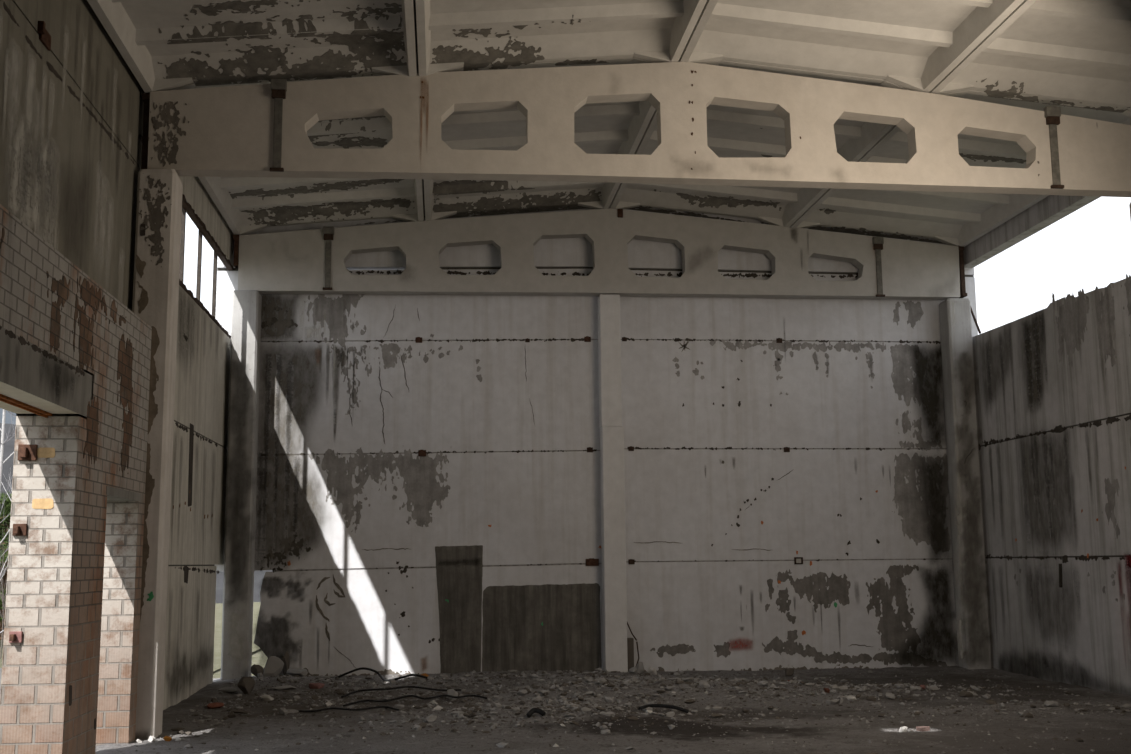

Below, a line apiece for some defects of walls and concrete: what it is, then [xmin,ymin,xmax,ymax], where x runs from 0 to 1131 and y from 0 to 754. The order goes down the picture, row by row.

peeling [158,0,407,86]
peeling [430,15,609,71]
peeling [229,179,602,226]
peeling [136,254,149,314]
flaking render [47,271,134,477]
leakage [1022,313,1047,406]
peeling [140,326,160,620]
peeling [288,447,494,532]
peeling [627,300,951,672]
leakage [900,335,1009,665]
leakage [1000,654,1100,687]